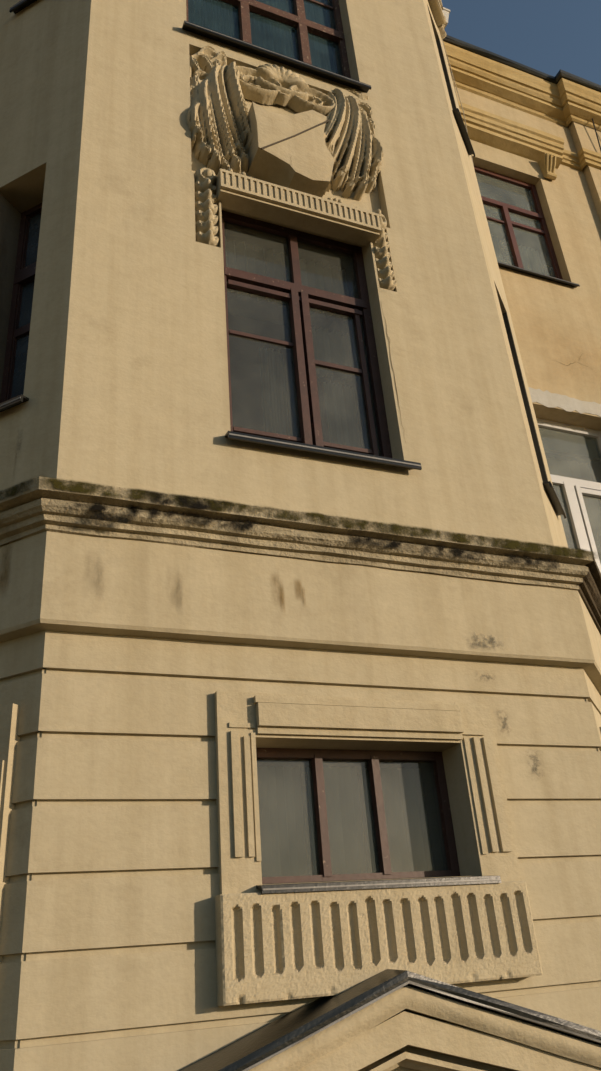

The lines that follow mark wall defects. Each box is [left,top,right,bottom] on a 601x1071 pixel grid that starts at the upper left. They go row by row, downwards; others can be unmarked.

damp [75,492,256,530]